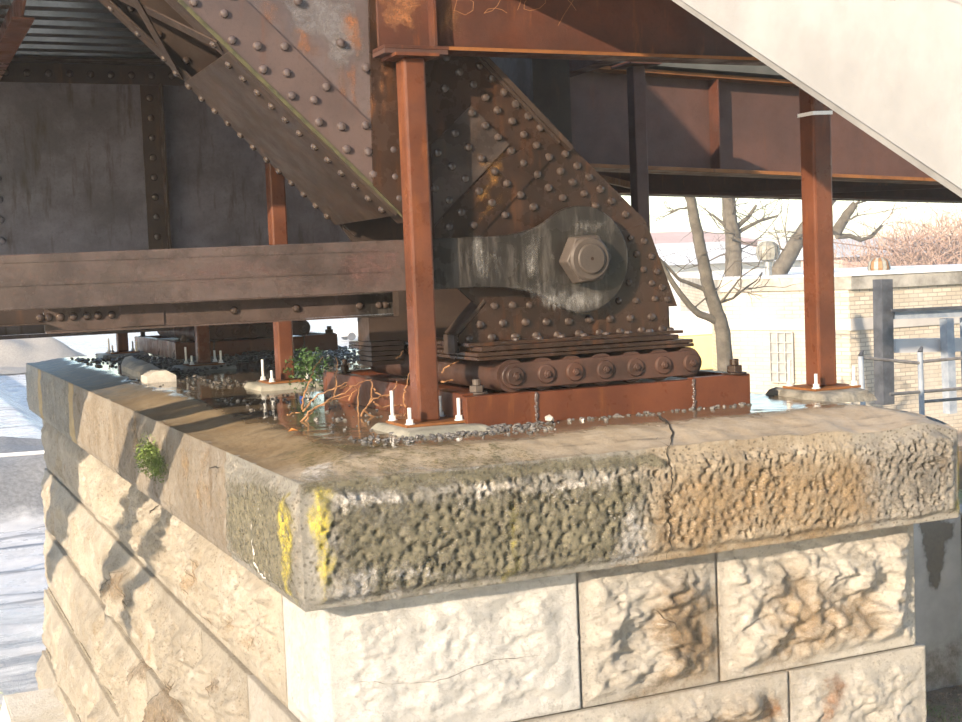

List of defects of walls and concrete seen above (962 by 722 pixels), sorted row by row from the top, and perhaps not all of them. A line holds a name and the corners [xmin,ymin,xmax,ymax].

corrosion [381,0,418,27]
crack [654,414,674,560]
leakage [920,489,962,589]